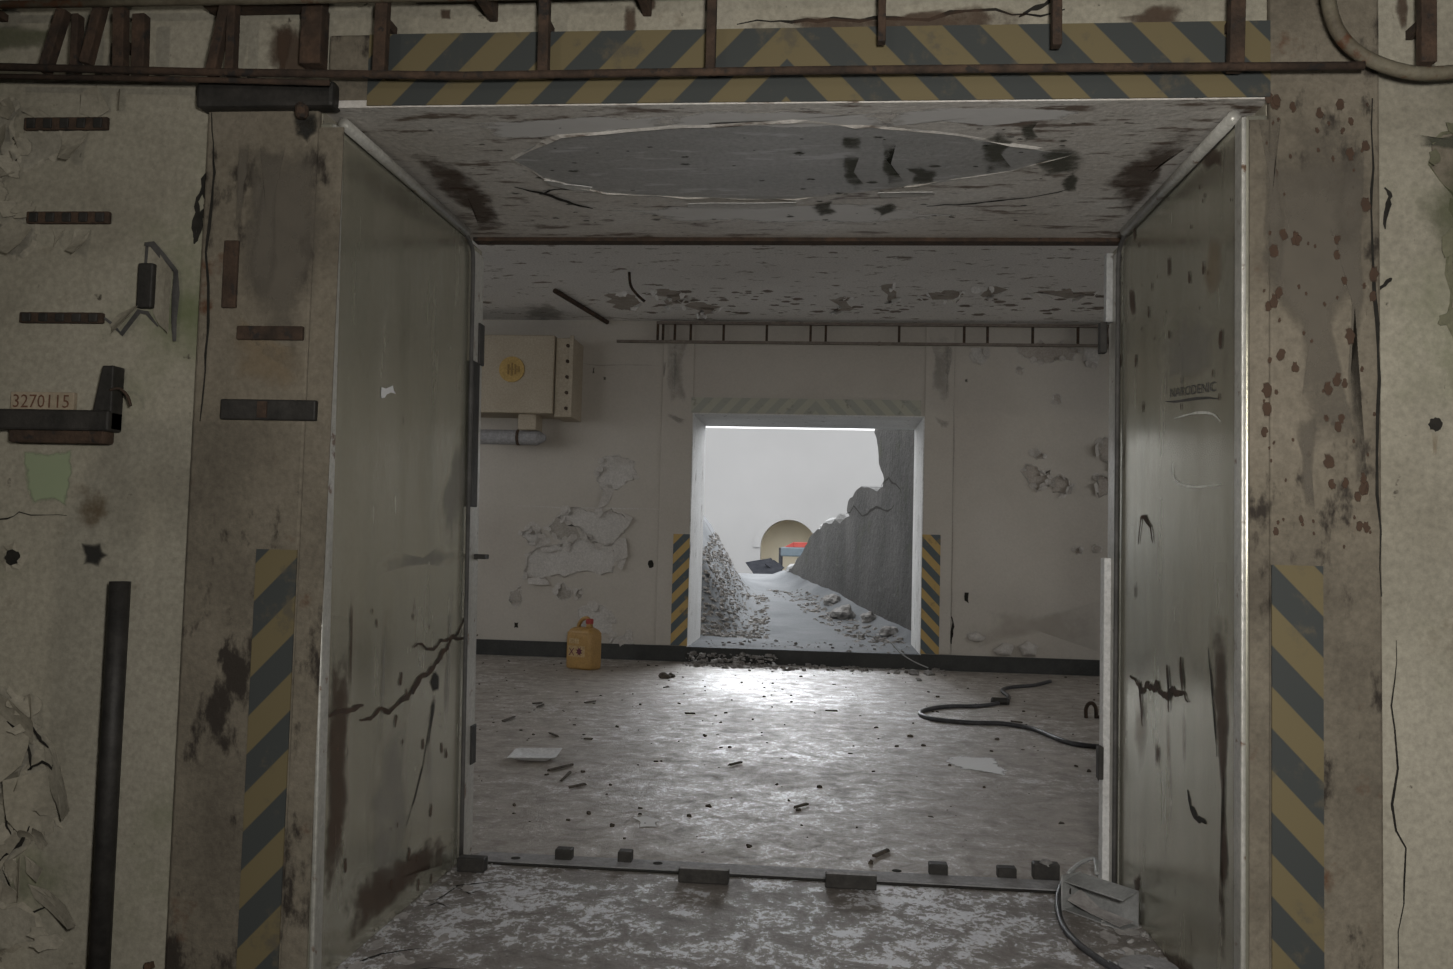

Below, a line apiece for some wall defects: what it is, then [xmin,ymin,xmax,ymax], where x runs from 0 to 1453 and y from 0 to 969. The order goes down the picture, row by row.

peeling [0,86,120,261]
peeling [1428,122,1453,201]
peeling [1438,228,1453,337]
spalling [1428,417,1443,432]
peeling [1019,447,1076,498]
peeling [1093,437,1108,498]
crack [0,512,67,520]
peeling [552,582,634,646]
peeling [0,686,76,956]